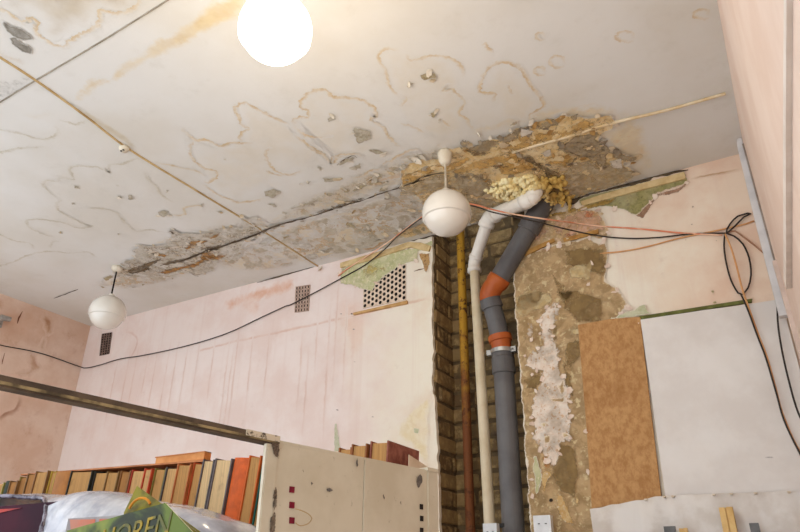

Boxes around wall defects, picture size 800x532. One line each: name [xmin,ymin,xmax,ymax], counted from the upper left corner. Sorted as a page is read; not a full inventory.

peeling [2,22,33,55]
water stain [0,0,143,50]
water stain [74,0,248,101]
peeling [407,69,437,88]
water stain [153,88,401,204]
water stain [219,42,654,272]
water stain [0,157,141,267]
crack [130,173,444,277]
water stain [196,296,429,359]
spalling [95,113,754,532]